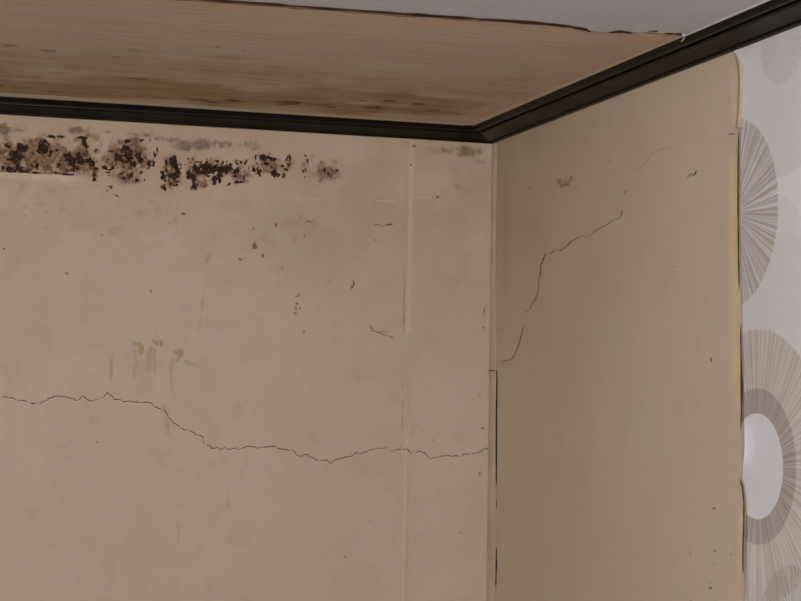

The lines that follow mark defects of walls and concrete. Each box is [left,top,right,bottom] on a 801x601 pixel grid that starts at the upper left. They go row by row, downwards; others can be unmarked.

water stain [0,124,355,282]
crack [488,190,626,371]
crack [0,392,488,465]